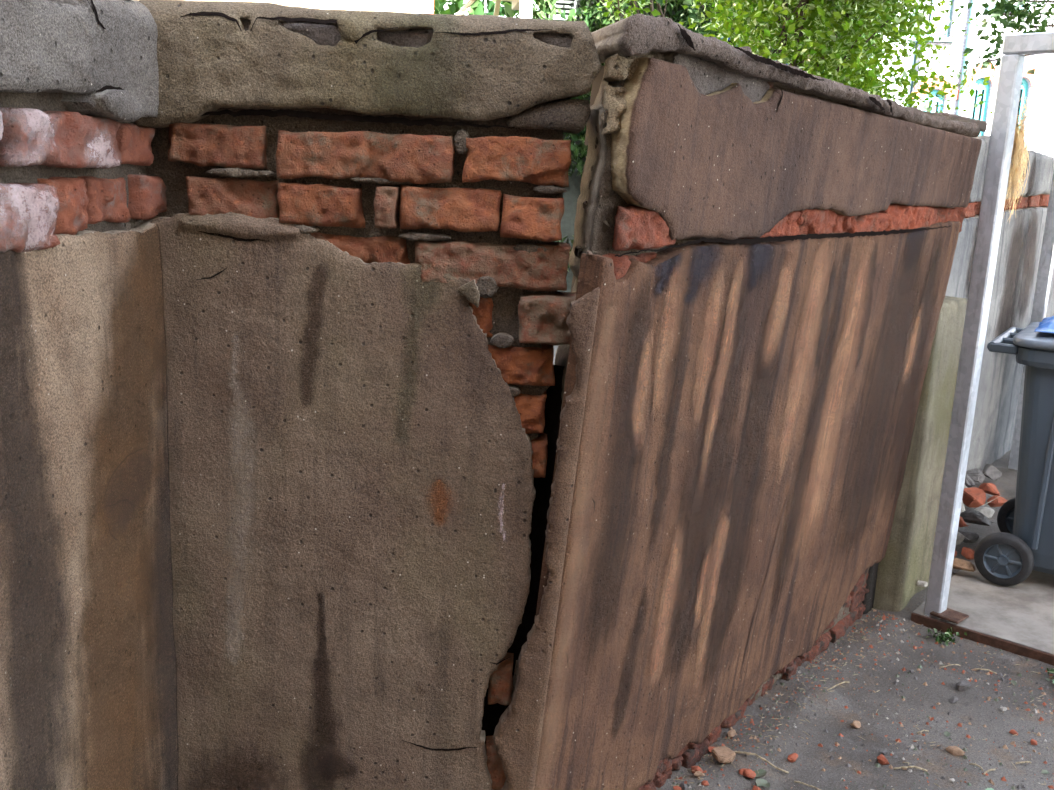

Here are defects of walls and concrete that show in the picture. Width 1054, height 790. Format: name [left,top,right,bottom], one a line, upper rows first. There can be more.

crack [87,0,106,29]
water stain [0,107,54,167]
flaking render [0,89,167,253]
water stain [86,132,120,169]
water stain [301,265,327,405]
flaking render [168,123,576,478]
flaking render [602,205,676,280]
flaking render [738,202,981,239]
flaking render [1003,194,1050,212]
water stain [0,183,67,790]
crack [402,365,565,751]
water stain [303,593,356,790]